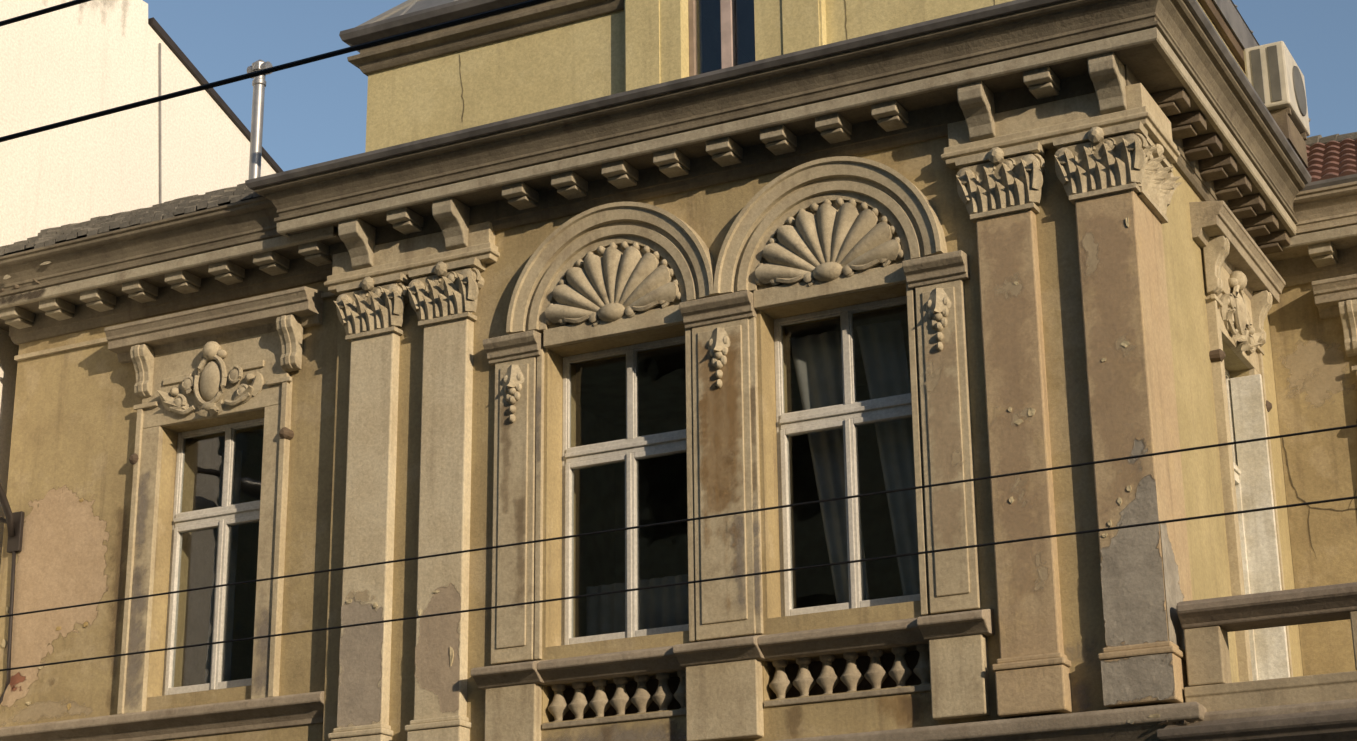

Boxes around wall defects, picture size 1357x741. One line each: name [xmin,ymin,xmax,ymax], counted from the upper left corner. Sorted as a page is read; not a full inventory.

flaking render [1,485,109,725]
peeling [337,590,384,727]
peeling [415,583,461,713]
leakage [732,519,762,608]
flaking render [1100,439,1191,726]
crack [1282,437,1357,556]